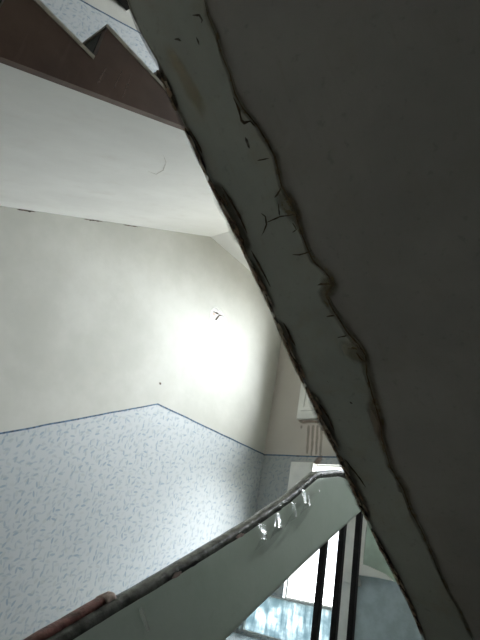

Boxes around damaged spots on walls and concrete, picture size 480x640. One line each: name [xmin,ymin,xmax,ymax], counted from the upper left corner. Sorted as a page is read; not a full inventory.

crack [204,0,473,640]